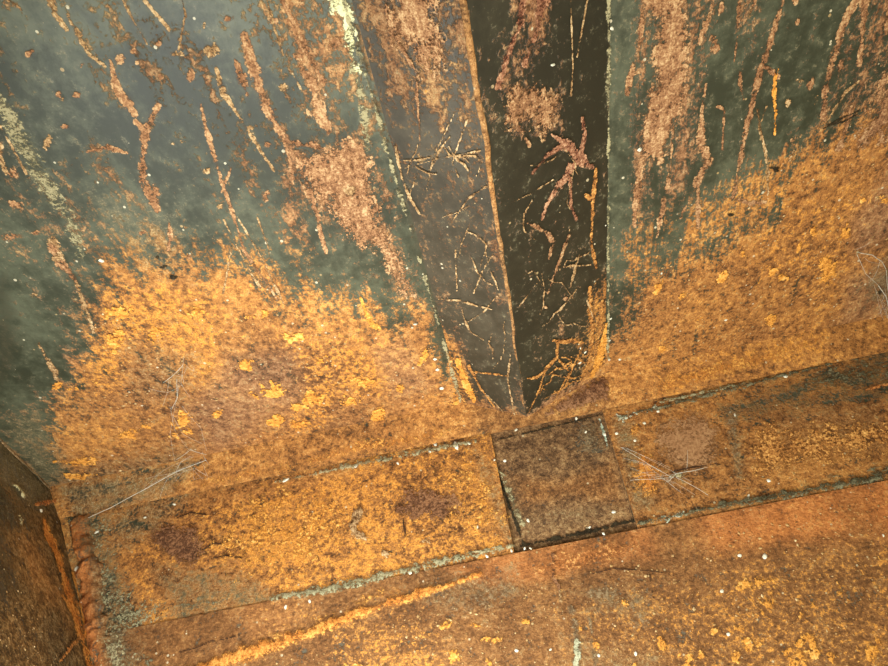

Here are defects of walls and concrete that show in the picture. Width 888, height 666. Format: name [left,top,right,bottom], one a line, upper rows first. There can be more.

rust [200,0,417,301]
peeling [328,0,370,152]
rust [384,0,453,141]
rust [495,0,598,301]
peeling [625,0,691,238]
rust [679,83,714,229]
peeling [835,60,888,152]
rust [38,342,79,390]
rust [249,380,329,430]
rust [446,353,507,407]
rust [527,286,608,413]
rust [789,633,820,666]